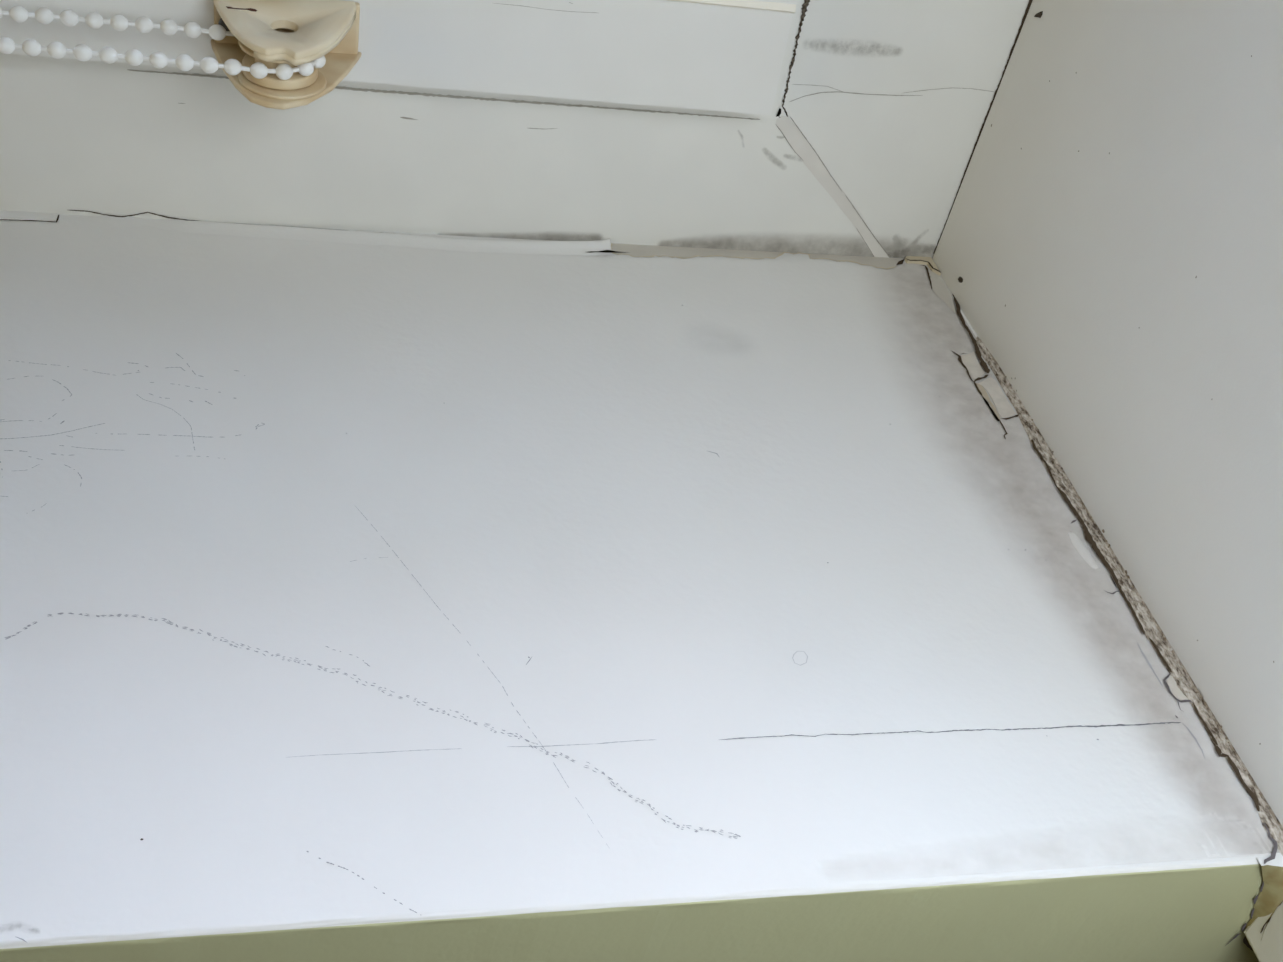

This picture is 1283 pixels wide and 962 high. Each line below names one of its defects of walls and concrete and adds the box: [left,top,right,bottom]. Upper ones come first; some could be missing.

peeling [0,210,958,316]
crack [721,294,1278,951]